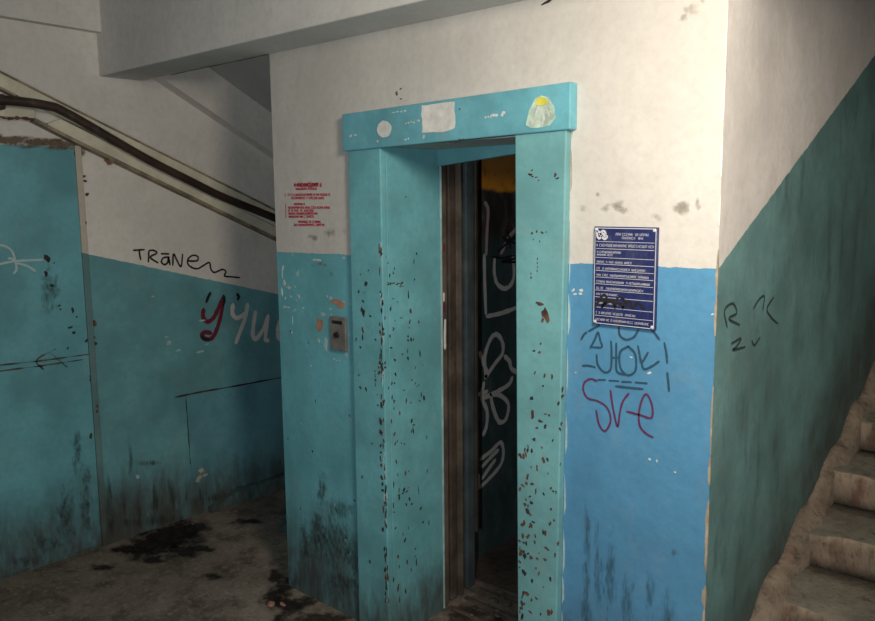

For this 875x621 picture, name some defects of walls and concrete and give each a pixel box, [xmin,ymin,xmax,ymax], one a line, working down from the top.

flaking render [0,134,85,155]
leakage [112,518,214,563]
rust [518,482,559,568]
leakage [263,569,352,621]